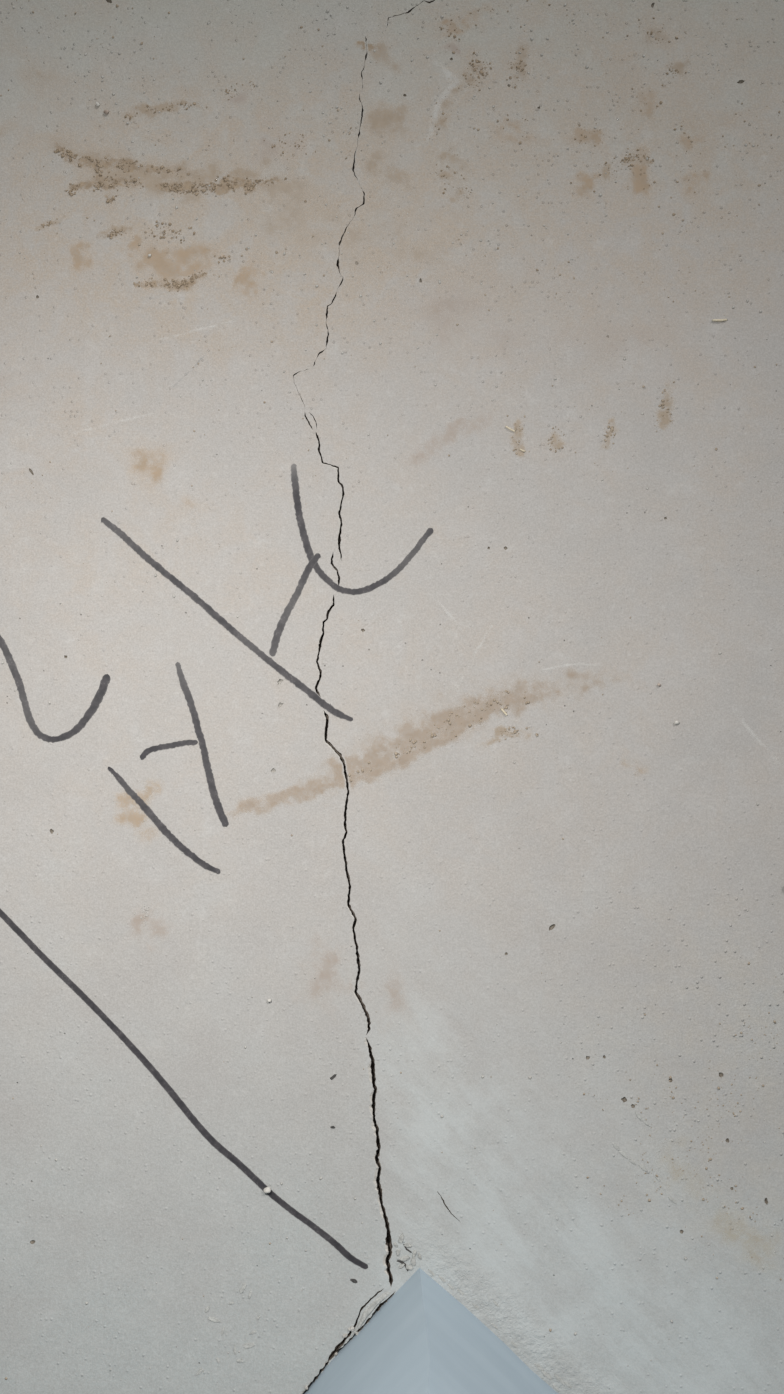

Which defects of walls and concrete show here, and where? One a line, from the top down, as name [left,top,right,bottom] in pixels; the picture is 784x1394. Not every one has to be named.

water stain [56,143,304,235]
crack [293,0,435,1394]